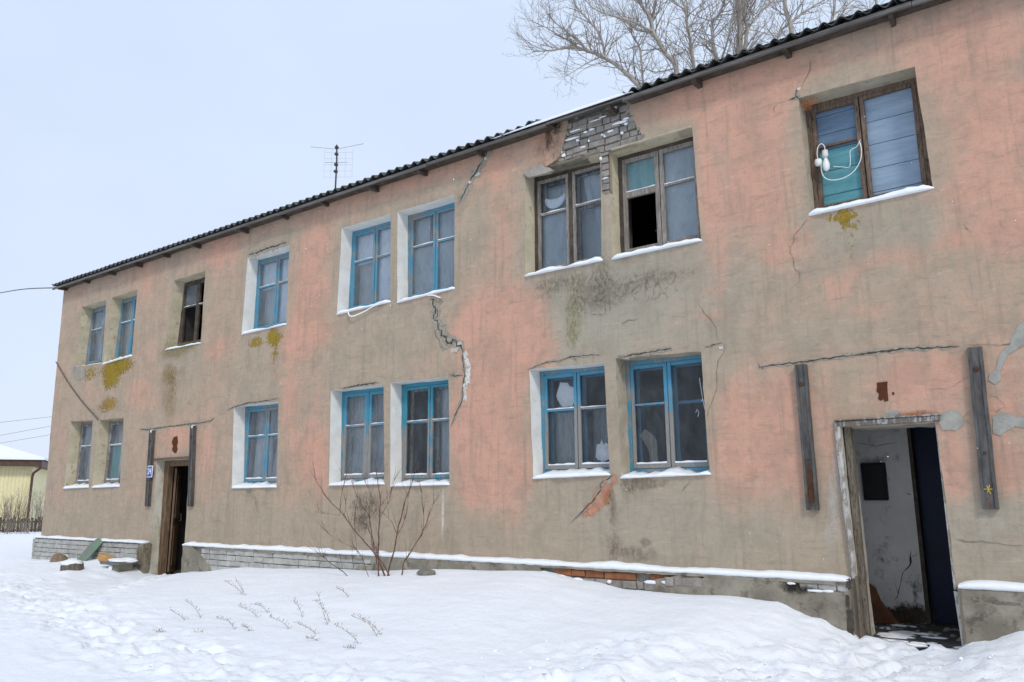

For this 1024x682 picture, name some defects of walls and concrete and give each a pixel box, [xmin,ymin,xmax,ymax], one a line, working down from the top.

crack [458,150,492,205]
flaking render [523,102,693,195]
crack [427,296,471,426]
crack [528,271,679,370]
crack [758,343,1010,369]
rust [876,382,894,401]